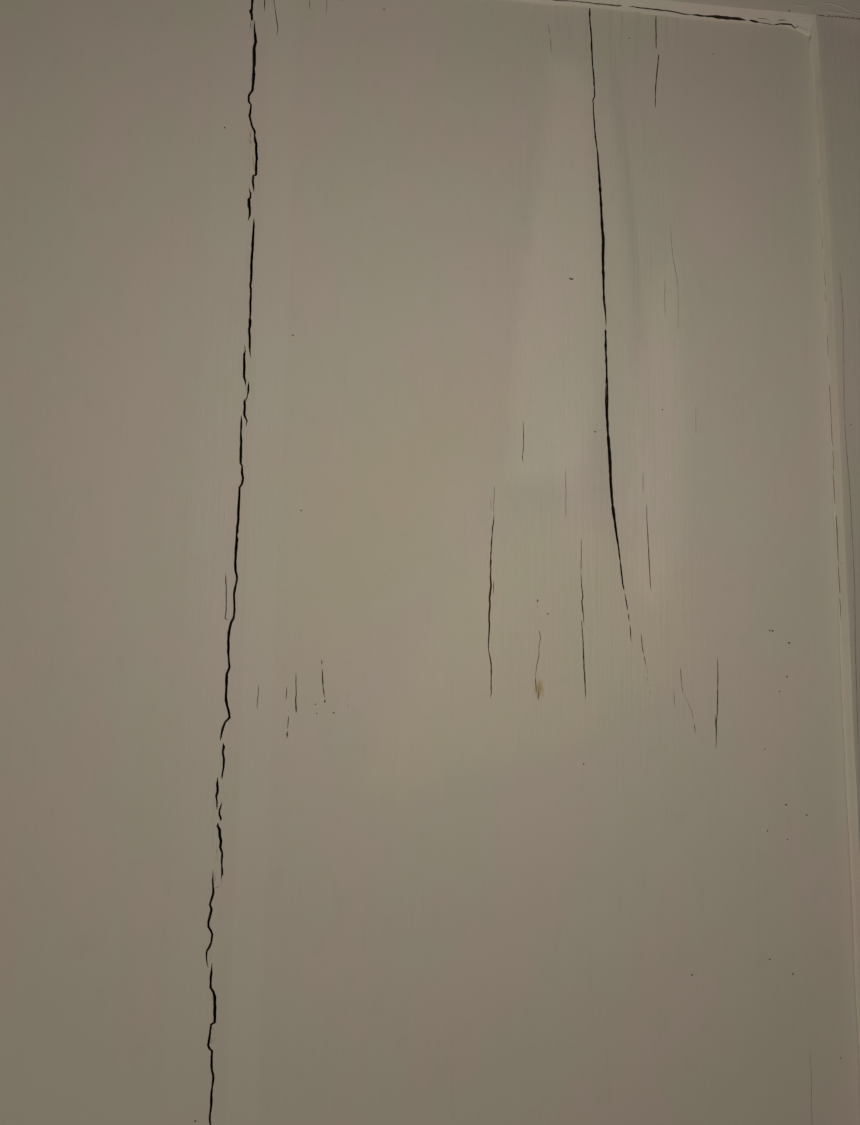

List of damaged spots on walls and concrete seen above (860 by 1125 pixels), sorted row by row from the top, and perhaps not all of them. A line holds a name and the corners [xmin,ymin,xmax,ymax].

crack [206,0,278,1125]
crack [286,661,326,737]
crack [487,488,495,699]
crack [548,0,798,742]